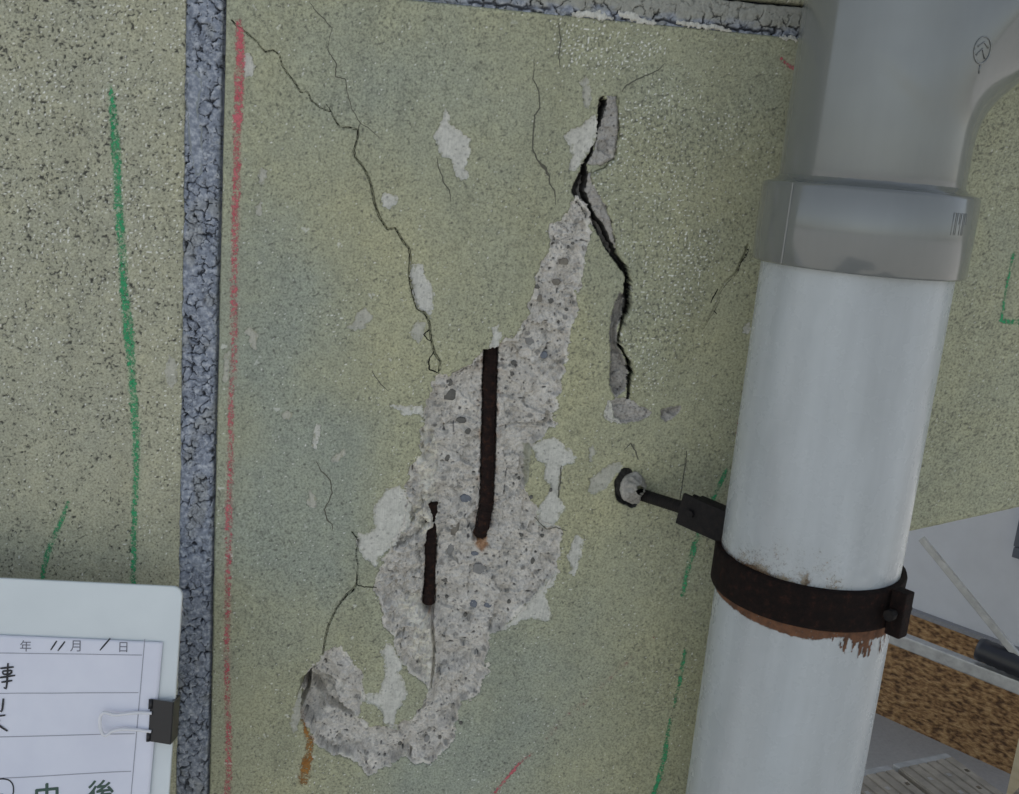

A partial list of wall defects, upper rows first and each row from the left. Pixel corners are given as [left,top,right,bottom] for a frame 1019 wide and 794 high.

crack [231,3,441,374]
crack [532,23,664,399]
crack [316,462,377,654]
spalling [289,76,619,776]
corrosion [298,708,314,785]